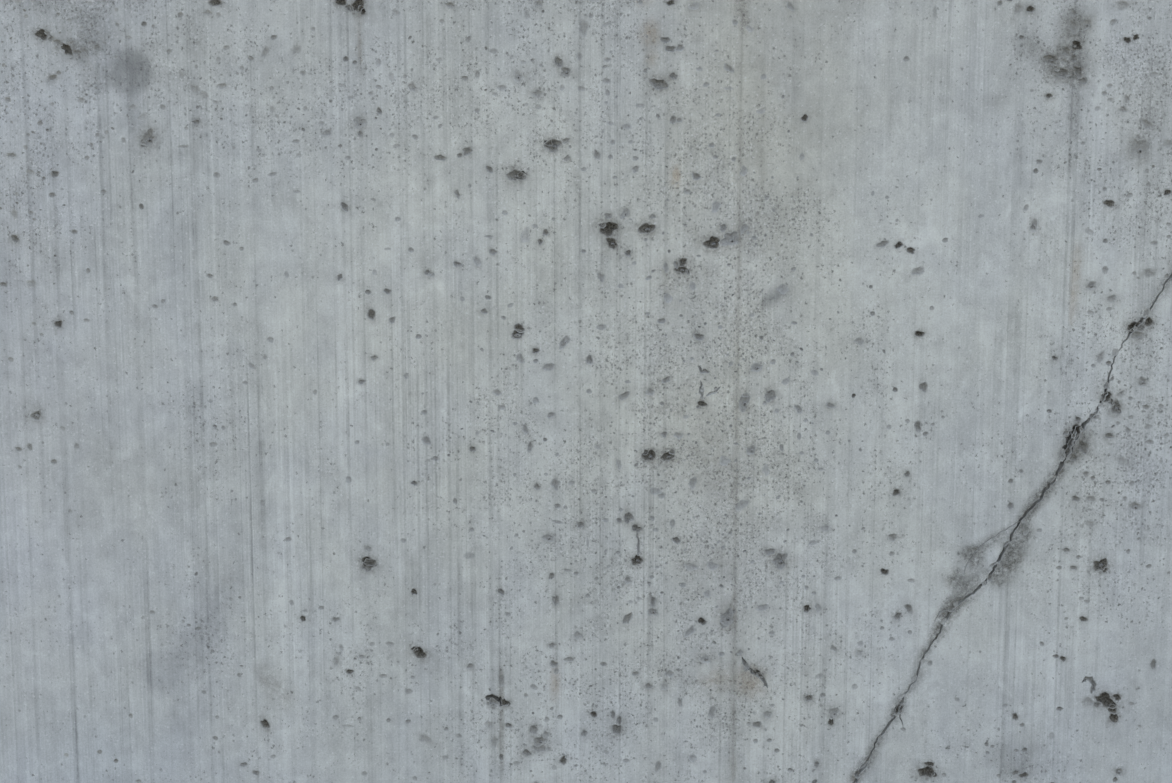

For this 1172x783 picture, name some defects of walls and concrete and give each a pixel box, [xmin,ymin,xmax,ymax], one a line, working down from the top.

crack [852,273,1172,783]